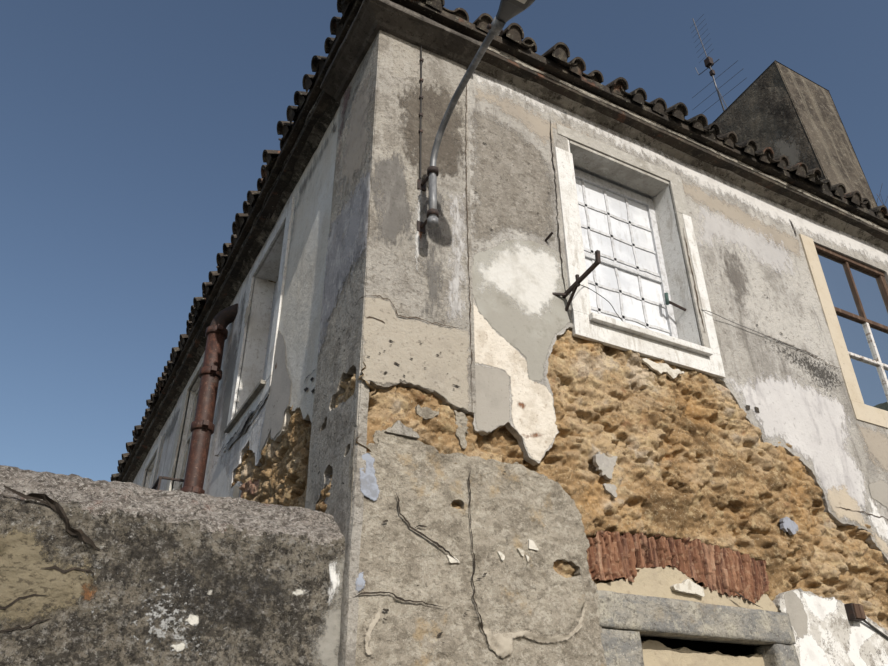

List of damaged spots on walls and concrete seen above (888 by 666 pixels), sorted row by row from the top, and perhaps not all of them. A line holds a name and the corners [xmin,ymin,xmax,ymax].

crack [358,85,473,414]
water stain [371,82,465,317]
water stain [476,242,562,317]
spalling [225,331,333,513]
crack [353,591,442,607]
crack [396,470,495,654]
spalling [334,297,888,666]